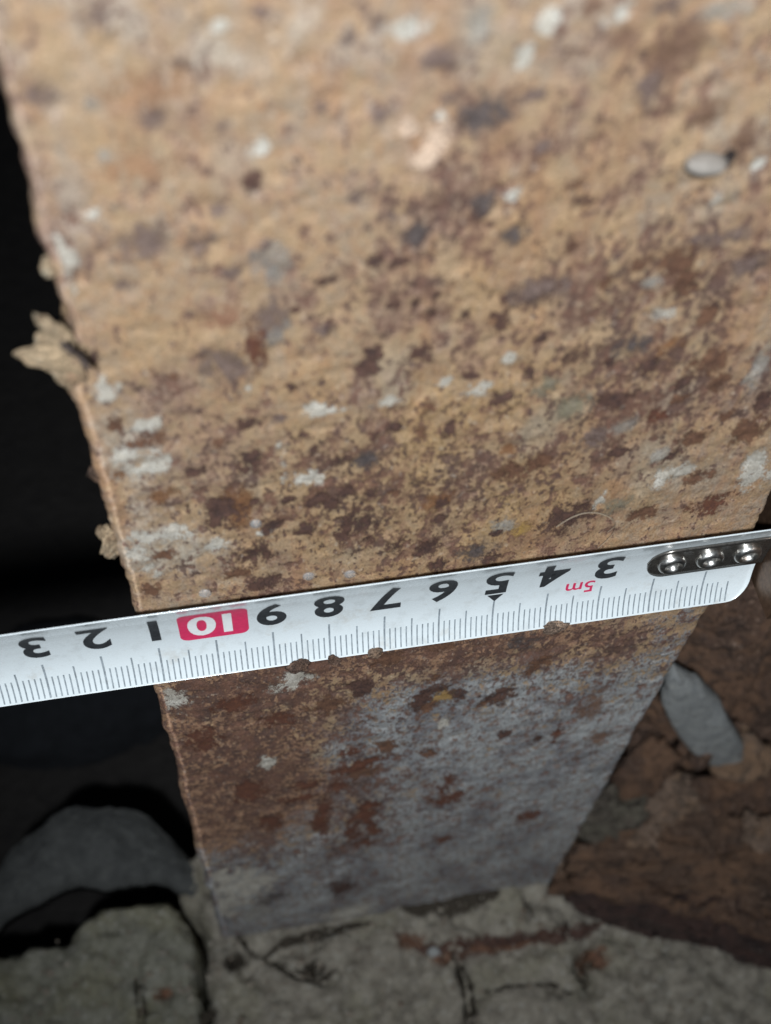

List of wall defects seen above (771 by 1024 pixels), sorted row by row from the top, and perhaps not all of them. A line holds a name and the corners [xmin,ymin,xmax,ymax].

corrosion [40,256,56,279]
corrosion [13,313,99,391]
corrosion [353,344,384,378]
corrosion [106,416,167,452]
corrosion [662,390,771,463]
corrosion [96,524,119,559]
corrosion [149,488,318,592]
corrosion [281,485,657,572]
corrosion [258,651,404,728]
corrosion [423,640,467,653]
corrosion [476,631,552,708]
corrosion [233,739,405,835]